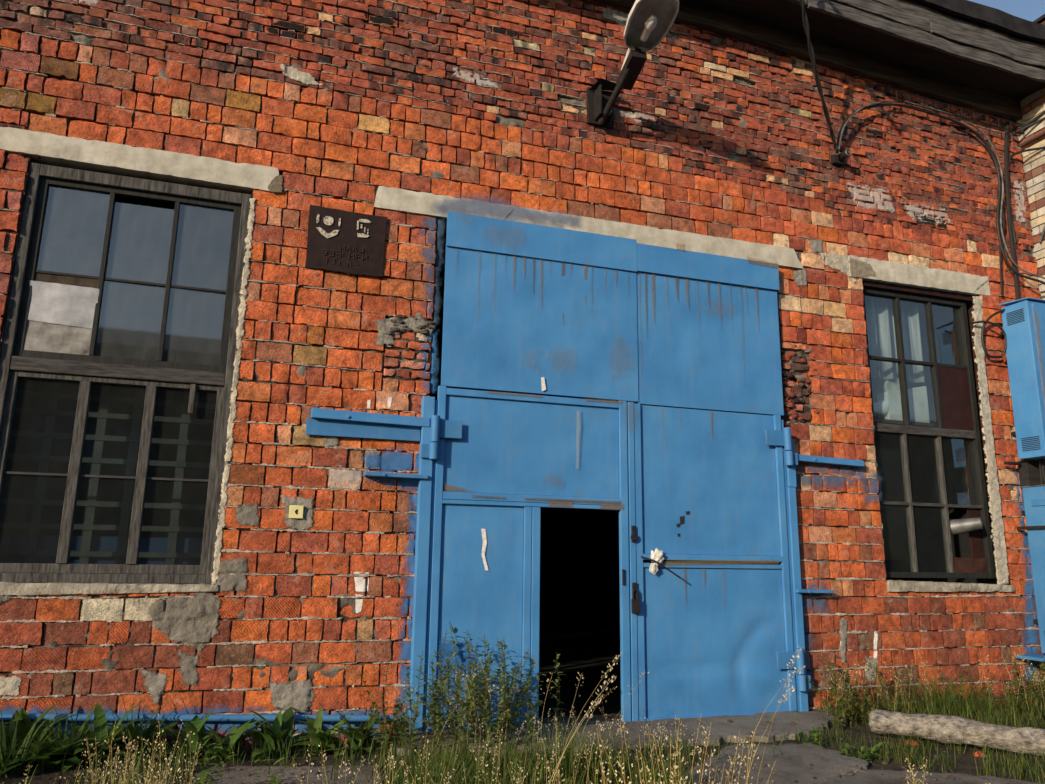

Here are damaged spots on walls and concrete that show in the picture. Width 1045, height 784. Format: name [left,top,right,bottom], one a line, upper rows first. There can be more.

spalling [384,314,435,335]